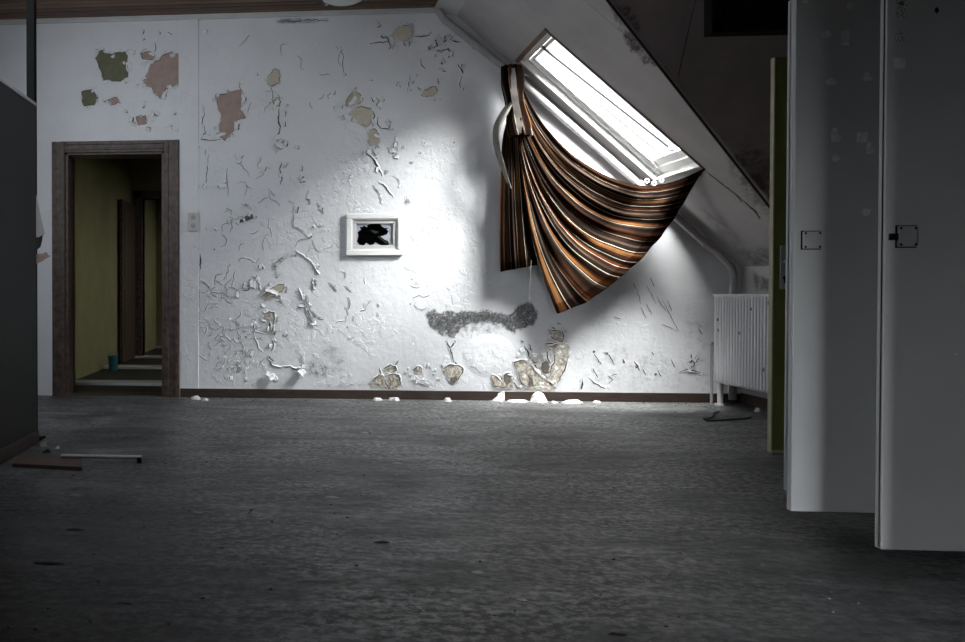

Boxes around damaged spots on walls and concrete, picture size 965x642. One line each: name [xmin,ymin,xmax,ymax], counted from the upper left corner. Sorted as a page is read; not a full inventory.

peeling [79,29,182,132]
peeling [309,77,405,159]
peeling [199,68,379,382]
spalling [357,224,389,245]
spalling [371,340,465,401]